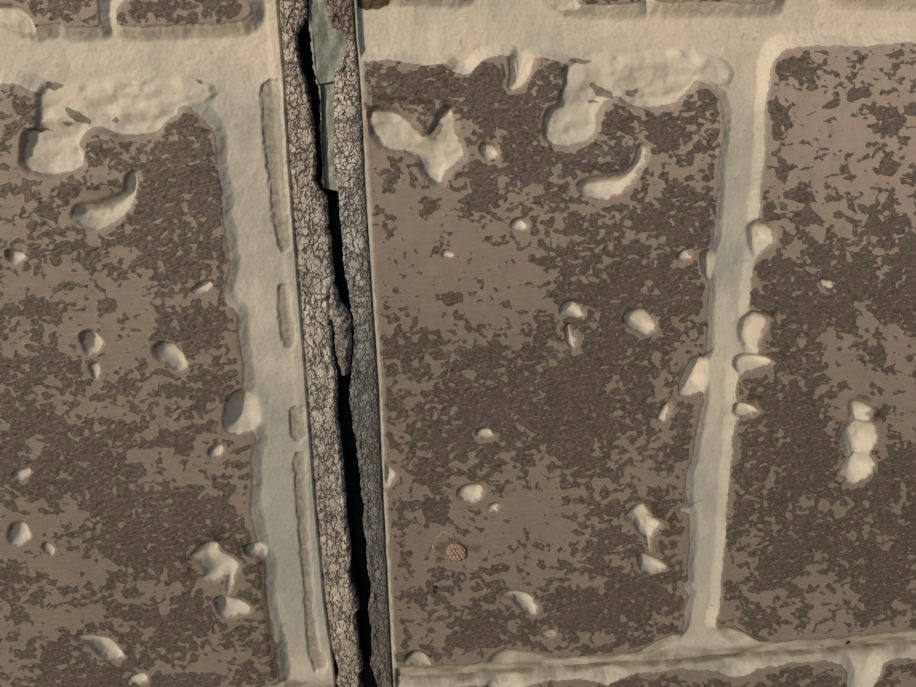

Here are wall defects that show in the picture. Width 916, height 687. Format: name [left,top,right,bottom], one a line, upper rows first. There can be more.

spalling [67,169,143,235]
spalling [19,74,217,179]
spalling [365,104,502,187]
spalling [503,53,539,93]
spalling [572,140,651,205]
spalling [541,46,733,150]
crack [280,0,392,687]
spalling [619,305,661,340]
spalling [729,309,776,377]
spalling [835,397,881,487]
spalling [621,501,669,577]
spalling [184,540,270,624]